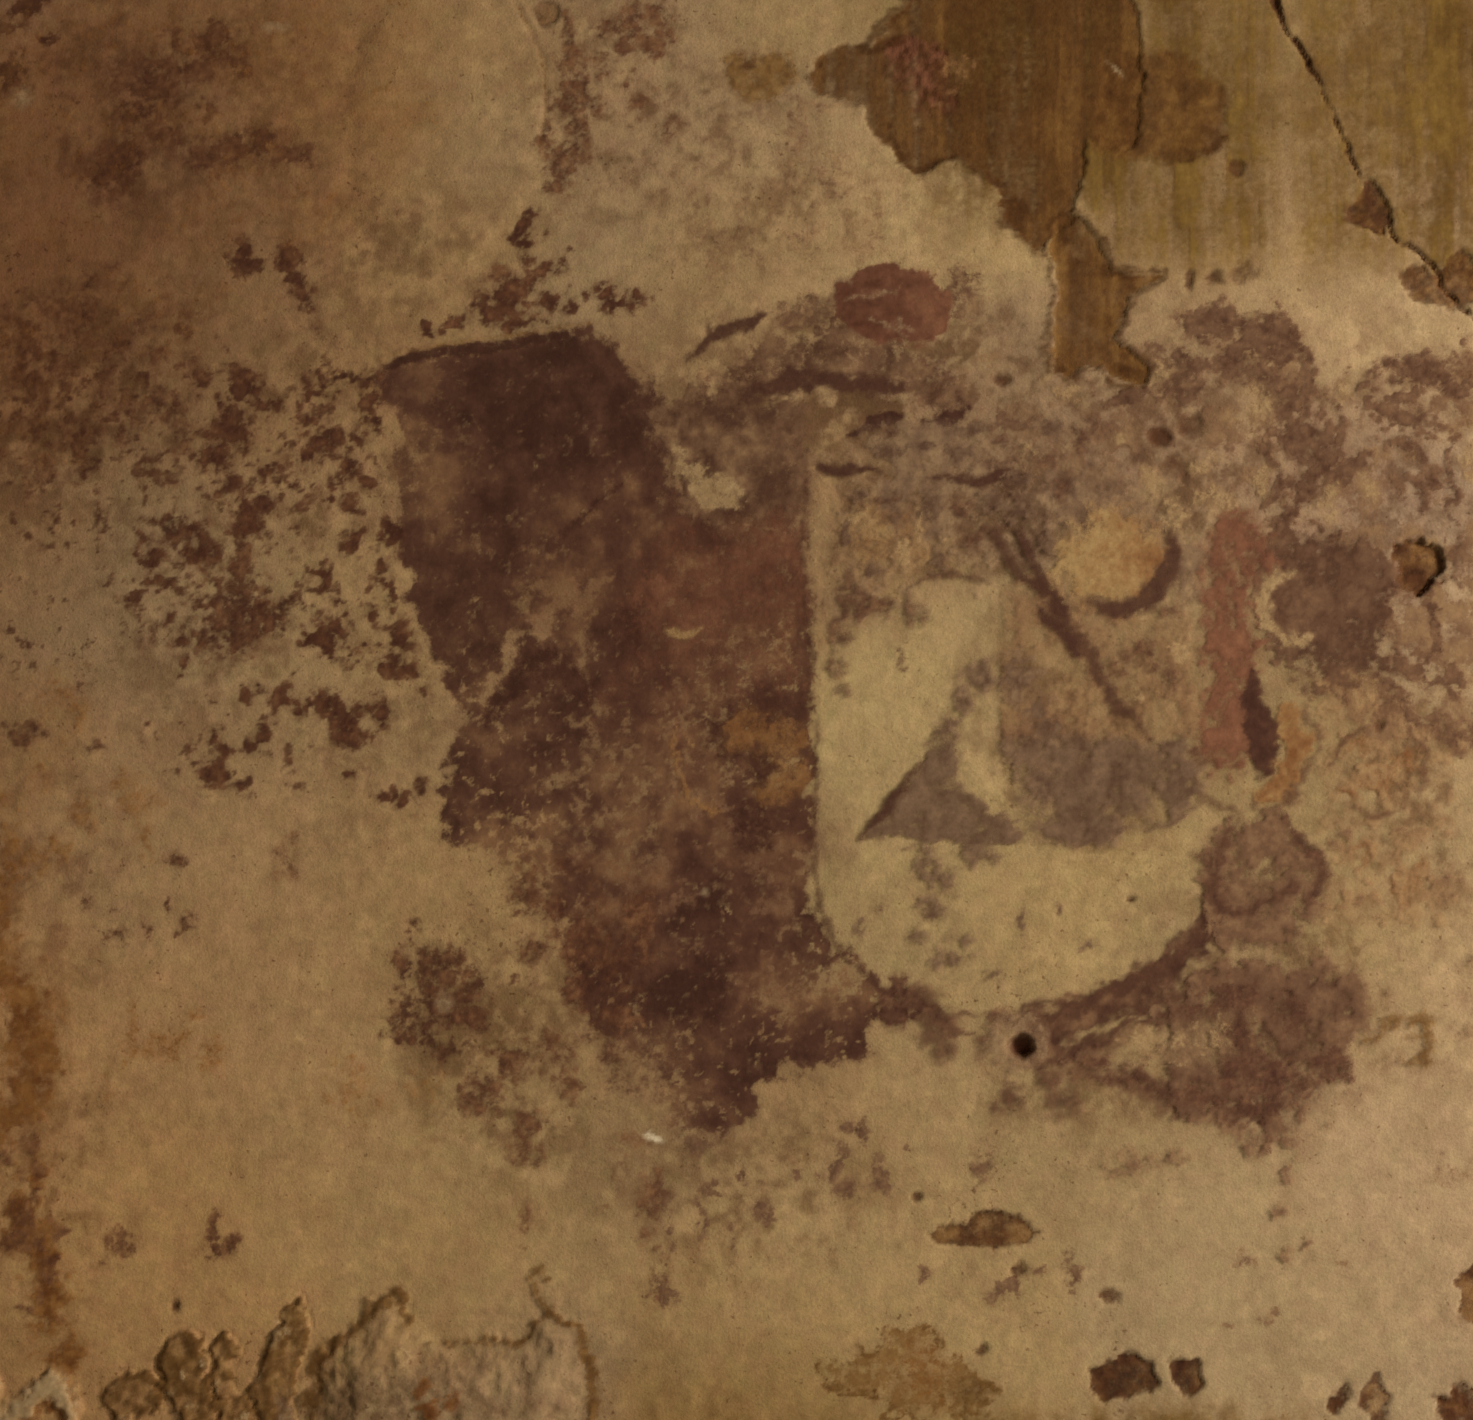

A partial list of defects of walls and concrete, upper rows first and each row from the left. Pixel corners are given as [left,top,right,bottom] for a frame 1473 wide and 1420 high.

crack [1271,0,1319,81]
leakage [77,18,314,205]
peeling [813,0,1227,388]
leakage [224,235,317,314]
leakage [0,263,426,697]
leakage [176,672,390,790]
leakage [378,777,427,808]
leakage [379,920,584,1165]
flaking render [932,1210,1034,1248]
peeling [100,1297,310,1420]
flaking render [1090,1353,1203,1401]
peeling [1438,1388,1473,1420]